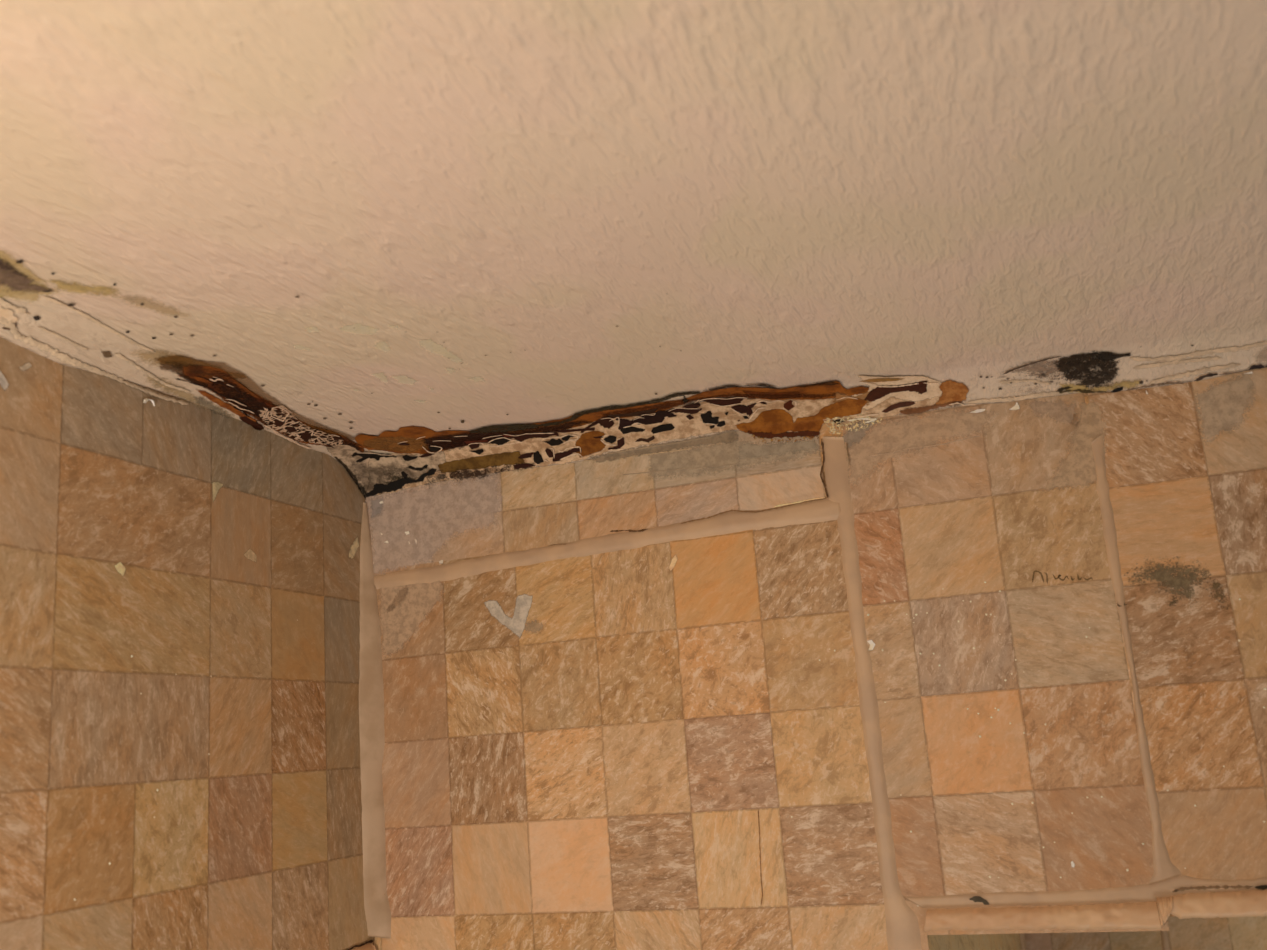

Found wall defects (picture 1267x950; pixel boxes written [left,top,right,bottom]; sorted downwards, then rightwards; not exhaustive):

damp [0,251,117,306]
damp [980,351,1164,394]
crack [1126,364,1267,391]
peeling [209,376,1067,495]
damp [1127,562,1228,609]